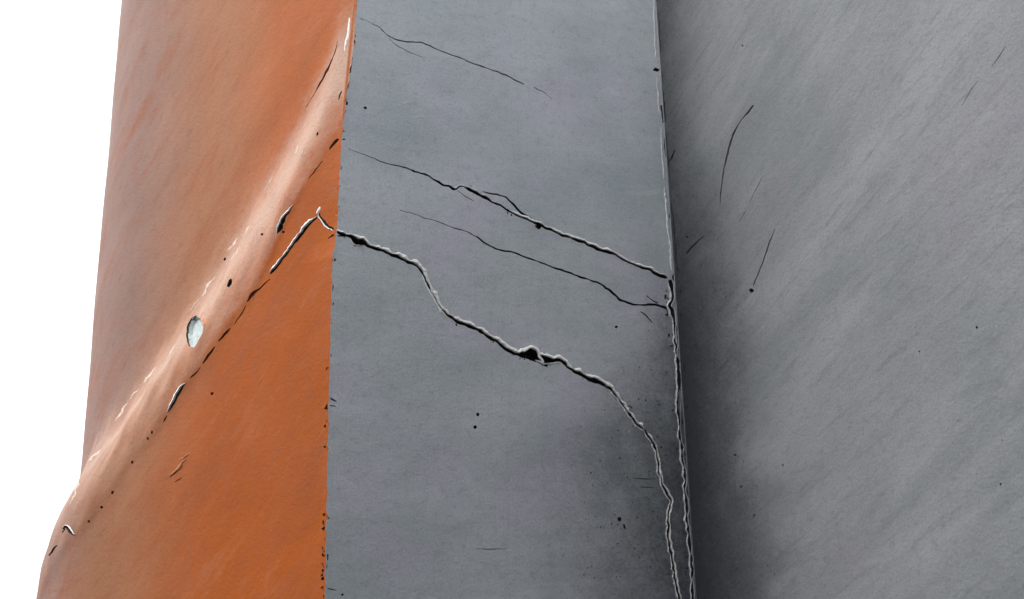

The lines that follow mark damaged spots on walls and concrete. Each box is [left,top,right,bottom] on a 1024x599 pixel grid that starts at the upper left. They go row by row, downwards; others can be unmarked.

peeling [115,299,205,421]
crack [147,0,695,599]